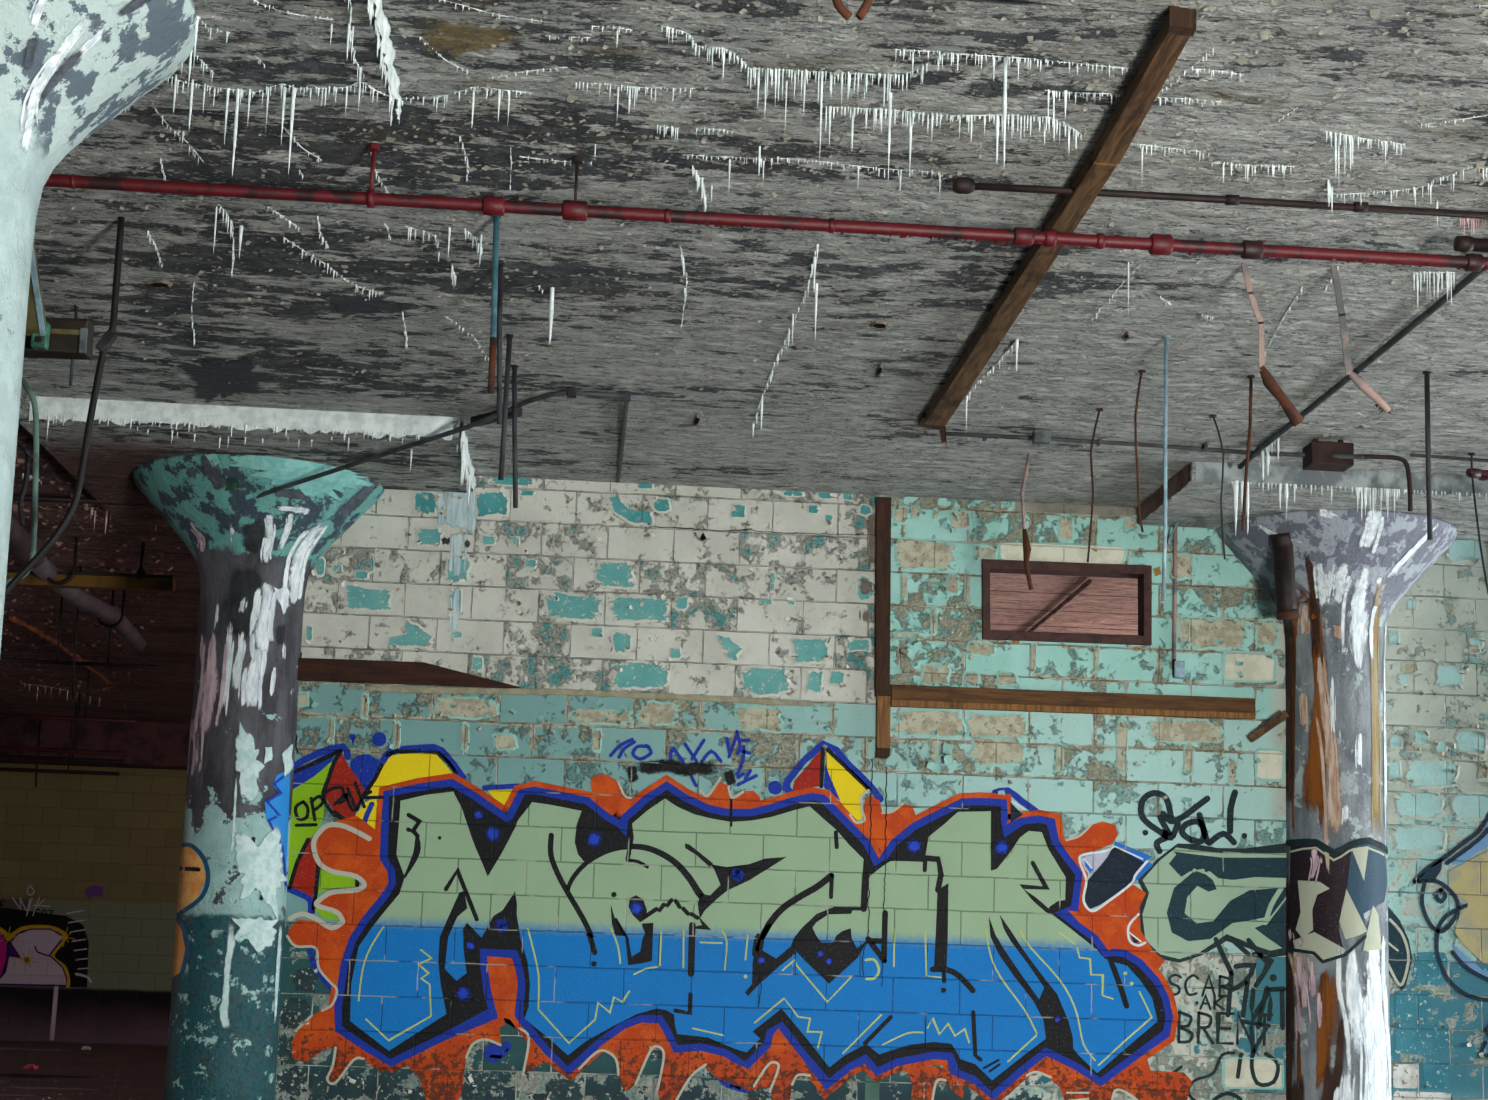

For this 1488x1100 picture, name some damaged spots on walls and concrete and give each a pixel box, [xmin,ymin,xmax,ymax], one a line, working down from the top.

leakage [29,0,48,31]
leakage [20,21,105,150]
leakage [154,0,695,182]
leakage [509,144,596,189]
leakage [657,26,1133,212]
peeling [12,0,1488,690]
peeling [537,560,872,753]
peeling [890,708,1031,795]
peeling [1115,718,1285,794]
peeling [1387,724,1488,855]
peeling [219,927,235,1027]
peeling [1221,1056,1284,1090]